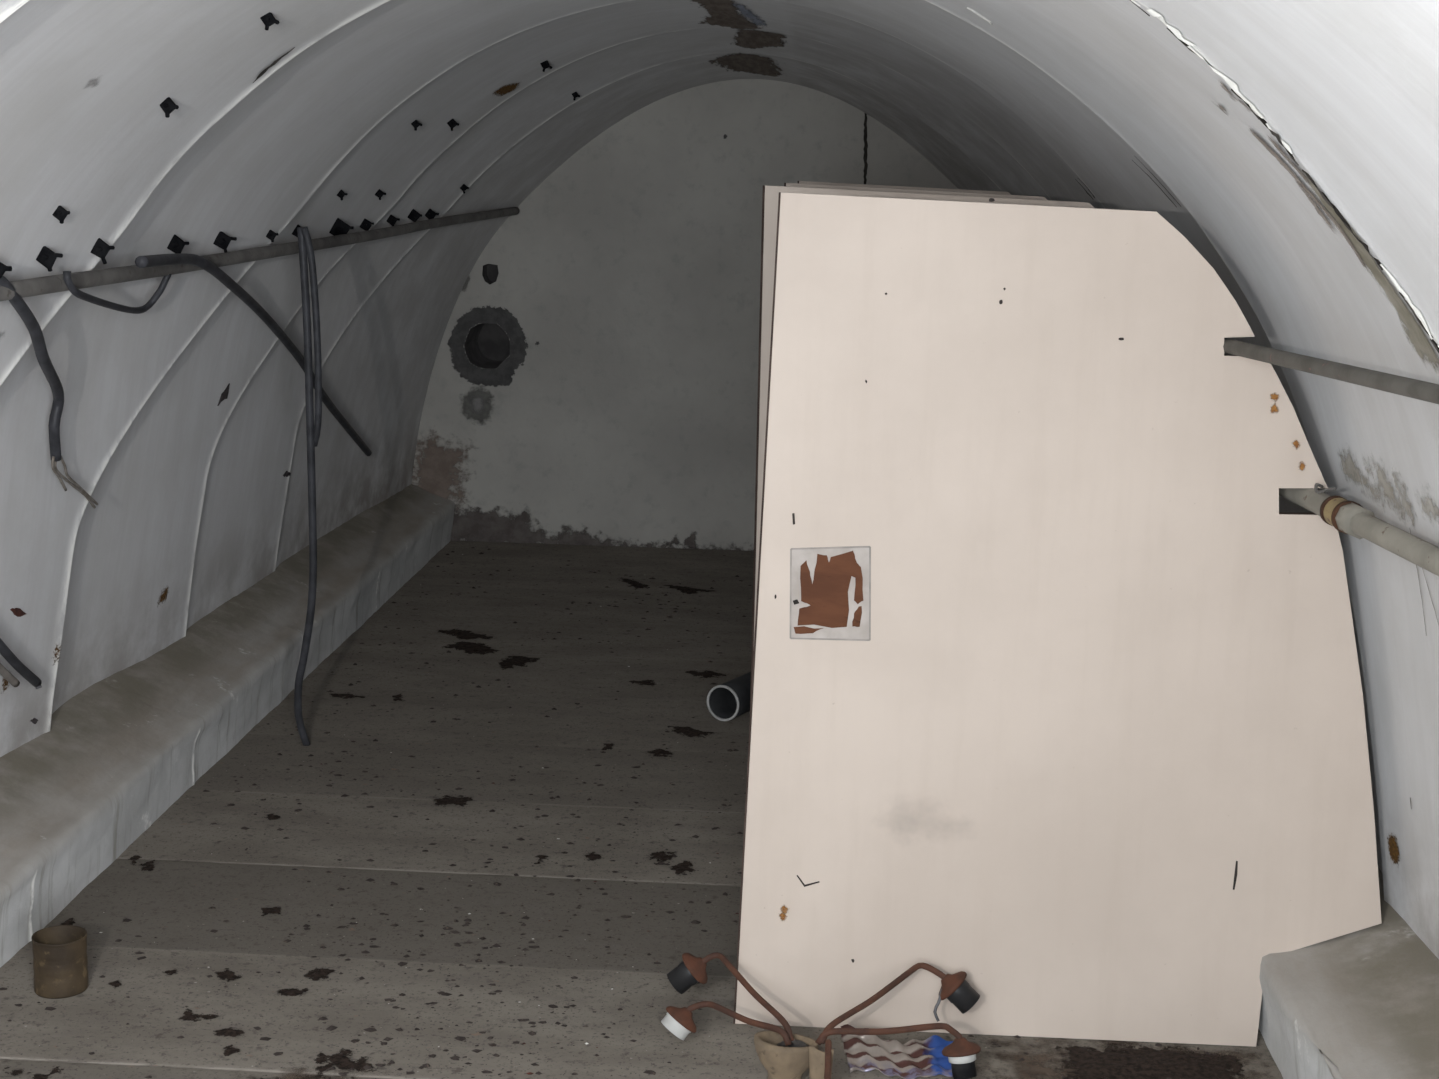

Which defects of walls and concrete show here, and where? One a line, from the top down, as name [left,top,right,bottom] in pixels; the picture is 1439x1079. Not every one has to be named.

leakage [411,434,754,551]
corrosion [1387,835,1399,866]